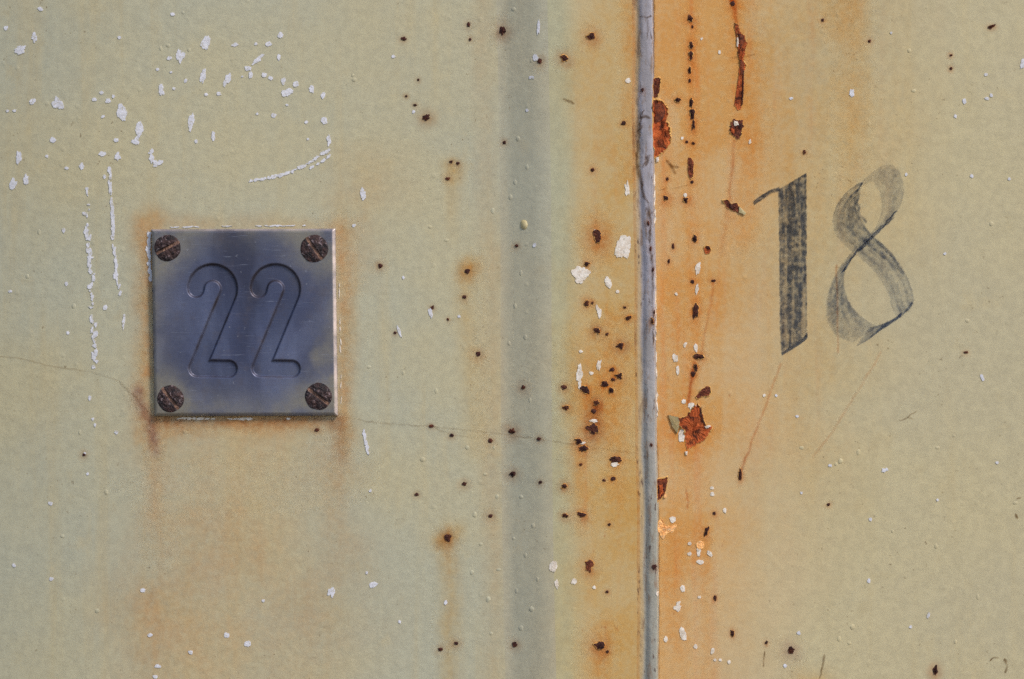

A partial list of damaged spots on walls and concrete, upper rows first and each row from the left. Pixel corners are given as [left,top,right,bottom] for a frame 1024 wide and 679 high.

peeling [14,32,37,55]
peeling [52,96,64,109]
peeling [156,32,326,118]
peeling [249,117,331,182]
peeling [9,174,29,190]
peeling [92,91,163,296]
peeling [82,187,108,369]
peeling [656,386,713,455]
peeling [657,476,668,504]
peeling [658,516,678,540]
peeling [687,508,726,565]